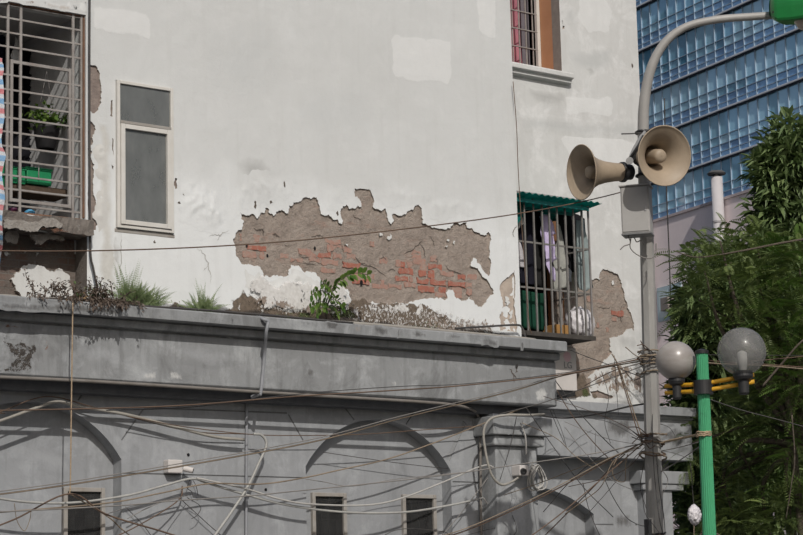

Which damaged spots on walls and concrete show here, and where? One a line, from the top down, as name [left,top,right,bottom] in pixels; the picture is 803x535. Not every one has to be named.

peeling [91,66,101,113]
peeling [88,162,97,230]
spalling [2,217,65,245]
peeling [9,264,73,298]
peeling [233,189,516,332]
water stain [0,329,128,374]
peeling [553,270,640,399]